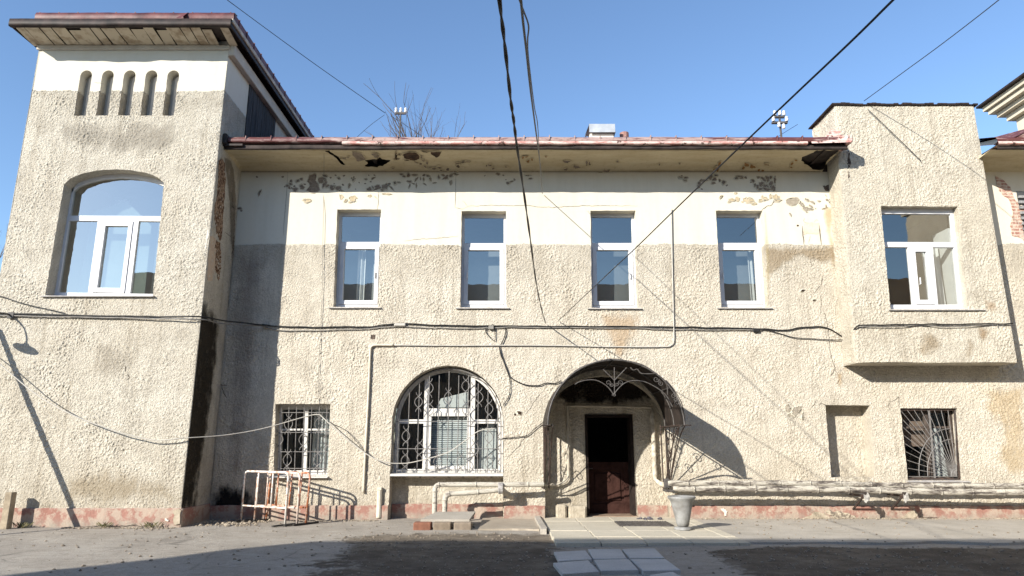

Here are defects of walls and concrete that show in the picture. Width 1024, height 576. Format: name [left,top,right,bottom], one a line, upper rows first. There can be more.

spalling [214,157,226,281]
peeling [281,150,471,204]
peeling [678,162,830,217]
spalling [995,176,1024,240]
water stain [182,304,218,508]